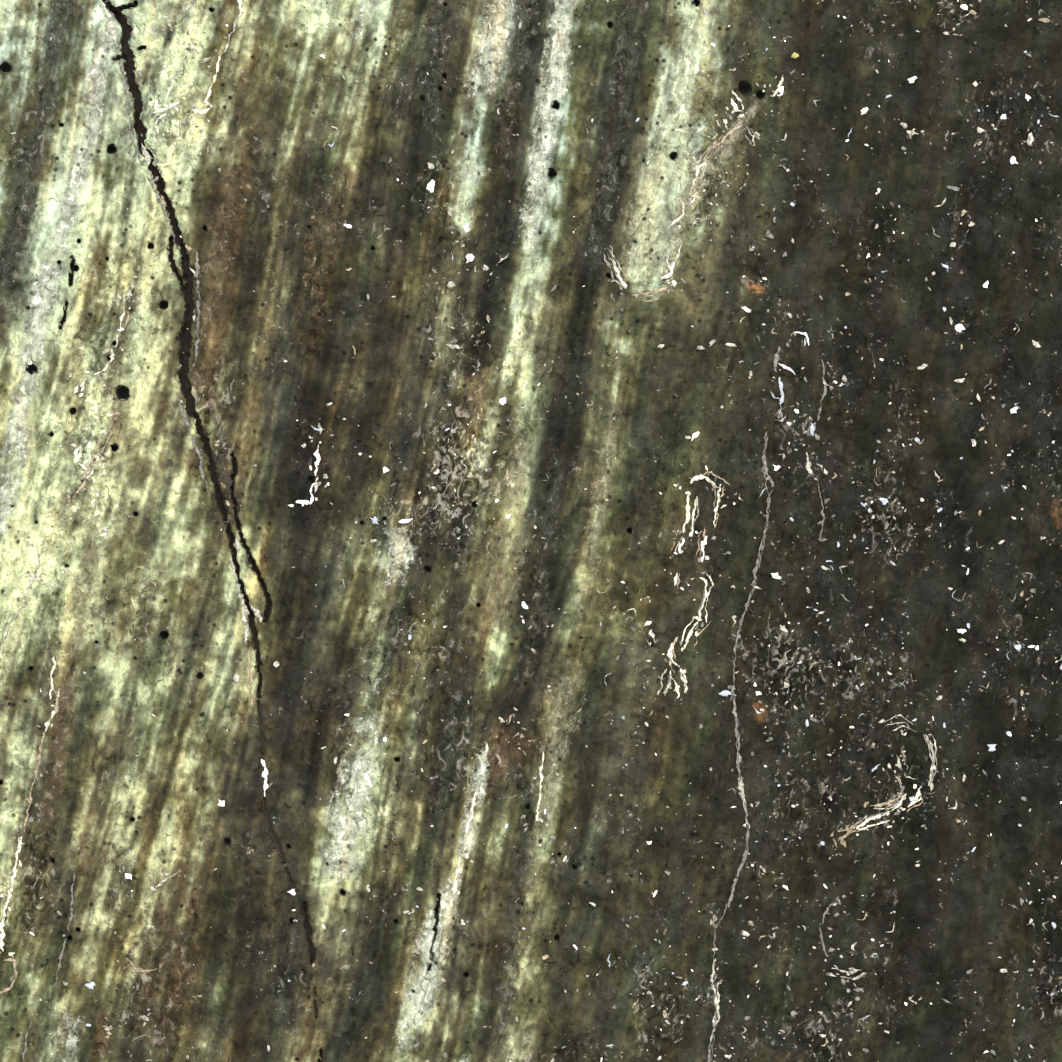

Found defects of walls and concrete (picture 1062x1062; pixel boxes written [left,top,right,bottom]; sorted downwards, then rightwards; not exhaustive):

leakage [464,0,522,95]
leakage [520,0,574,252]
leakage [622,20,757,280]
leakage [0,19,114,534]
crack [98,0,319,1017]
leakage [381,527,414,585]
leakage [491,440,535,620]
leakage [39,525,101,828]
leakage [324,716,380,883]
leakage [457,752,489,858]
leakage [53,1016,79,1062]
leakage [396,879,461,1051]